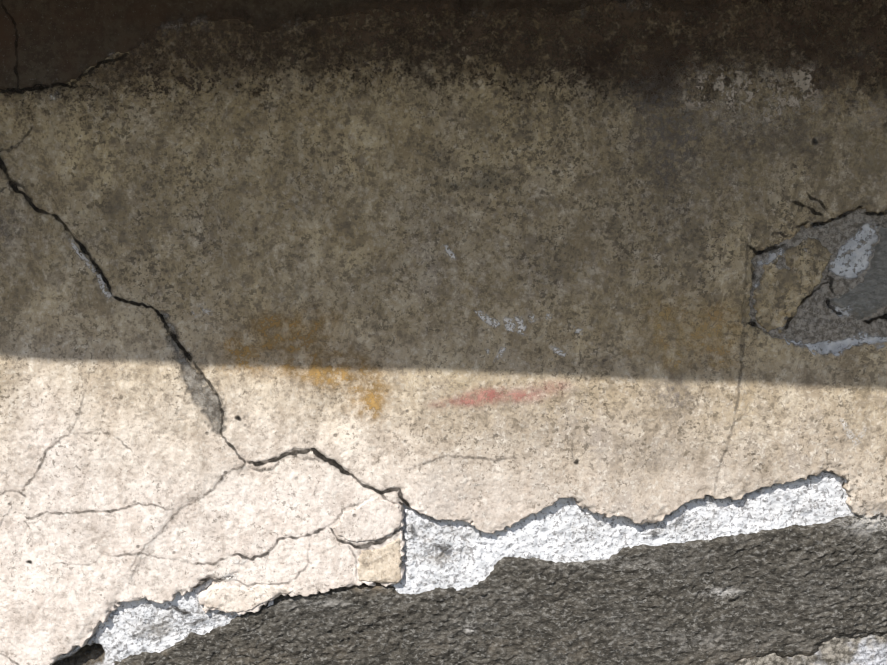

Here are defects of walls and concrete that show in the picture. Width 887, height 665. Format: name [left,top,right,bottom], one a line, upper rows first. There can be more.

crack [0,7,127,94]
damp [57,0,887,191]
crack [0,129,409,506]
spalling [746,208,887,356]
crack [27,502,175,519]
spalling [52,557,293,665]
crack [194,528,399,588]
spalling [332,471,854,594]
spalling [734,633,887,665]